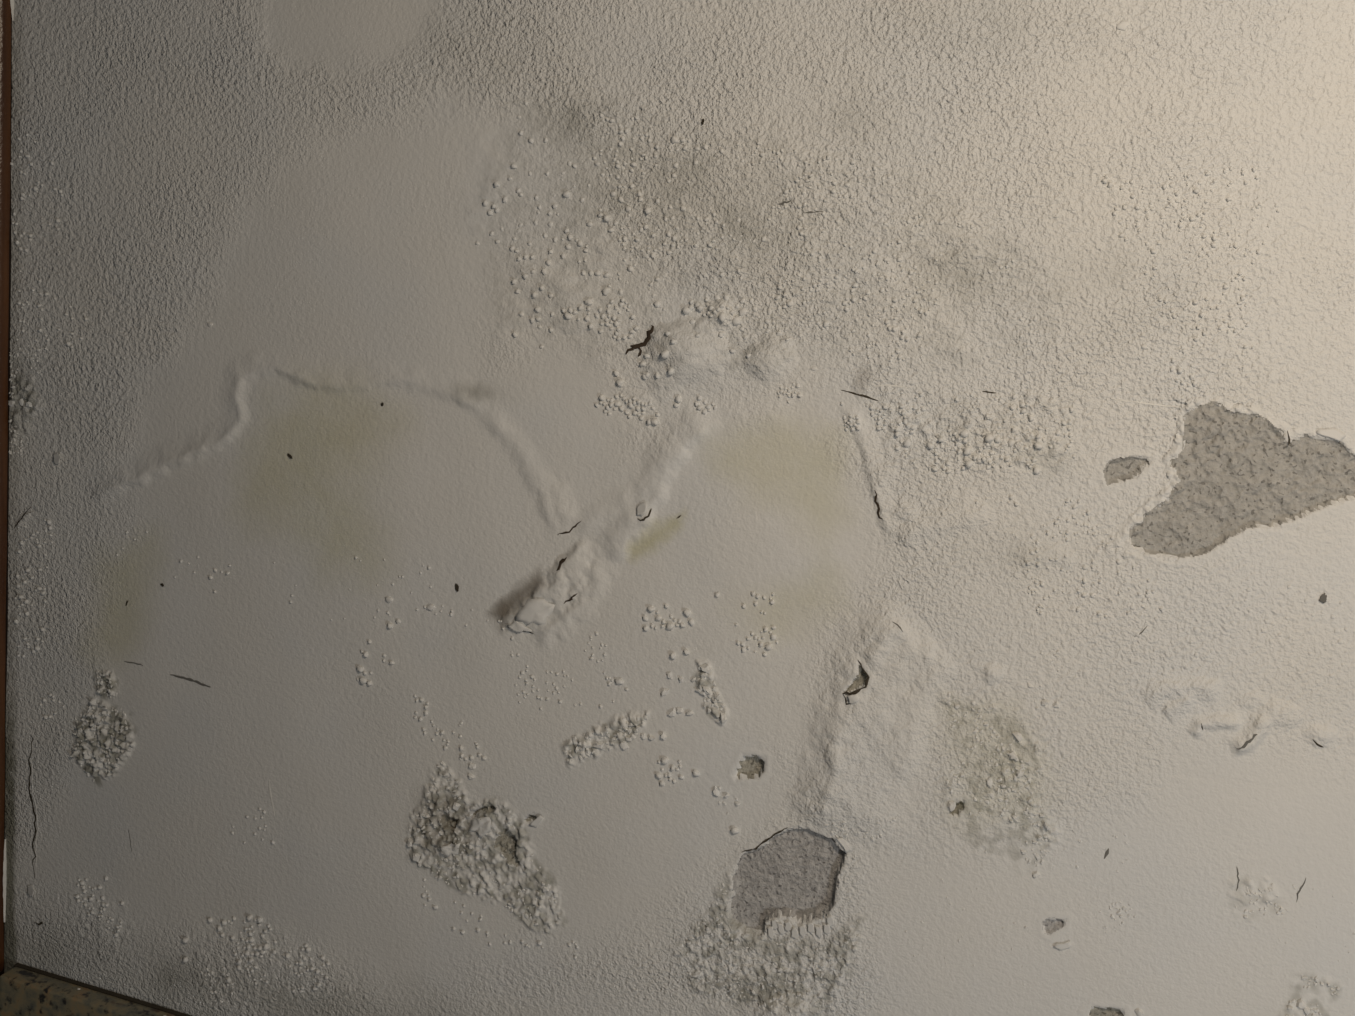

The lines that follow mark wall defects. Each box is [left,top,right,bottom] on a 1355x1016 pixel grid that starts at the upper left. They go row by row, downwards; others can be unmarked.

spalling [1094,395,1355,569]
spalling [64,660,144,793]
spalling [399,752,575,943]
spalling [551,652,739,776]
spalling [725,746,773,788]
spalling [665,822,875,1016]
spalling [941,692,1355,1016]